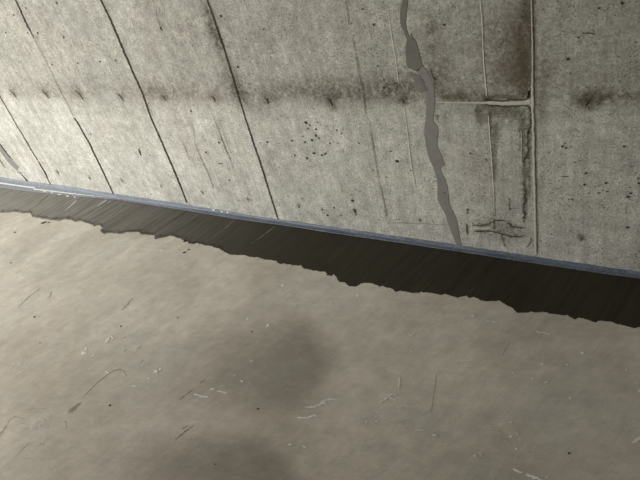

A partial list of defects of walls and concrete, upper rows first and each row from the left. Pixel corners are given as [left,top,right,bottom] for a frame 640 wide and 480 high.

leakage [480,2,532,162]
leakage [466,116,531,247]